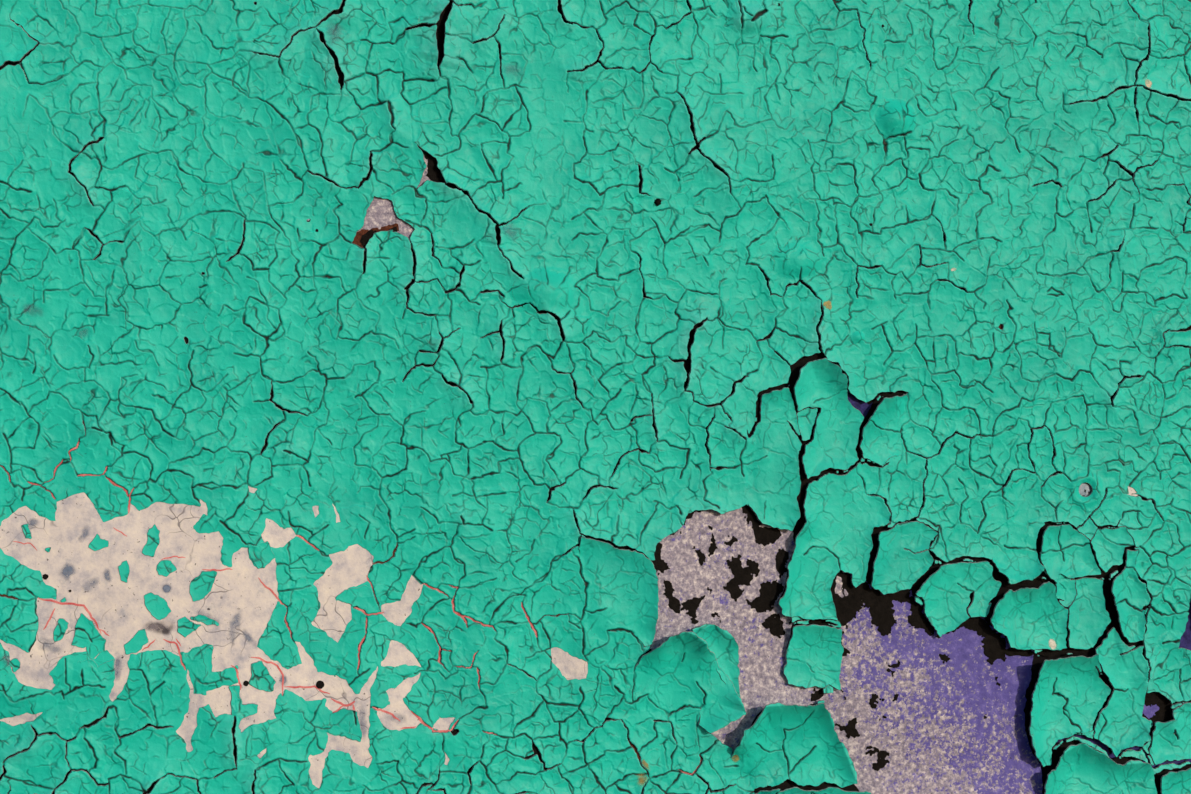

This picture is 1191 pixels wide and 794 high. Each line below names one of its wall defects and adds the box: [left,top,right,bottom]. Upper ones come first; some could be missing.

crack [253,0,346,90]
crack [405,2,471,75]
crack [557,0,731,194]
peeling [352,197,414,251]
crack [403,183,564,403]
crack [547,394,657,555]
crack [670,267,980,583]
peeling [0,492,459,788]
peeling [551,647,588,680]
crack [577,717,828,794]
peeling [634,358,1191,794]
crack [907,489,1149,705]